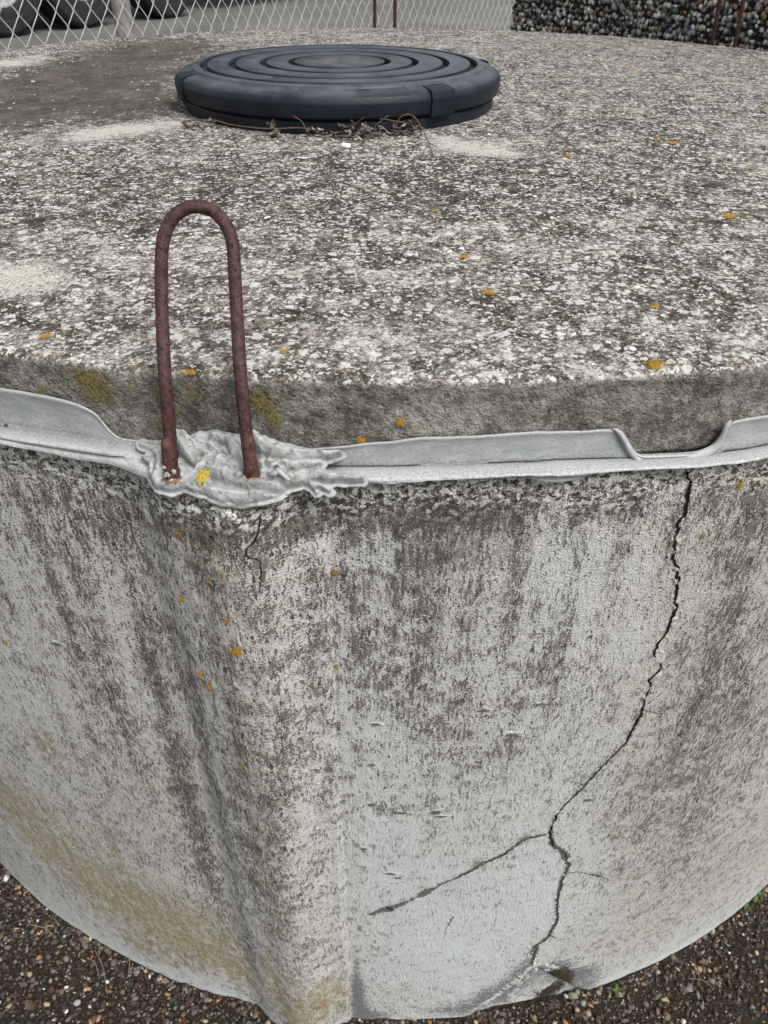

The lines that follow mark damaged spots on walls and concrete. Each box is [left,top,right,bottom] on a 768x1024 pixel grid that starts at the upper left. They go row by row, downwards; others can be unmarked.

crack [210,519,262,599]
crack [369,468,694,965]